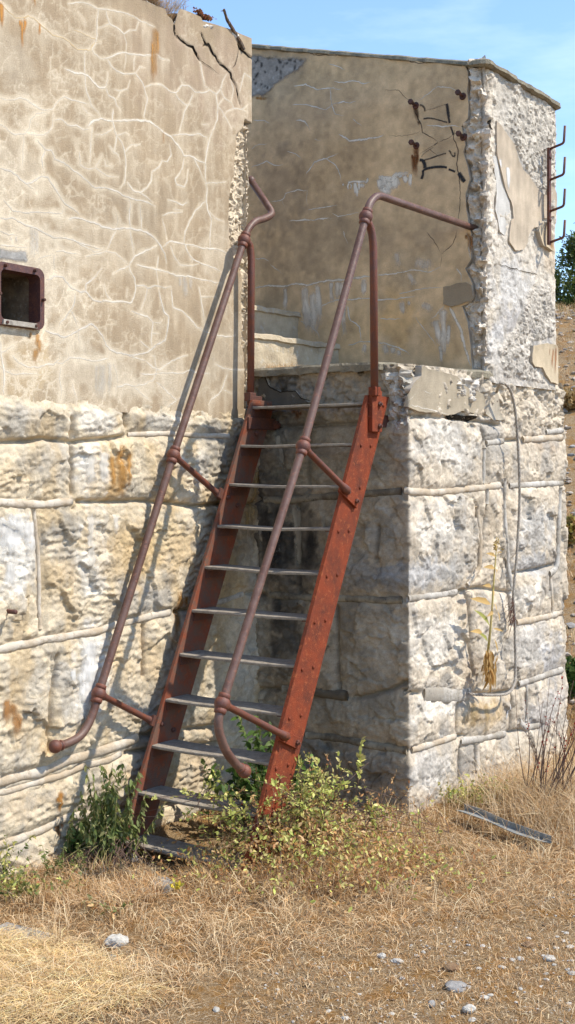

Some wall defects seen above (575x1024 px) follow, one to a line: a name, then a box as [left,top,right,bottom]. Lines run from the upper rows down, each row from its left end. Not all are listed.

crack [0,2,471,407]
spalling [228,122,311,409]
spalling [381,55,558,430]
rust [110,447,132,486]